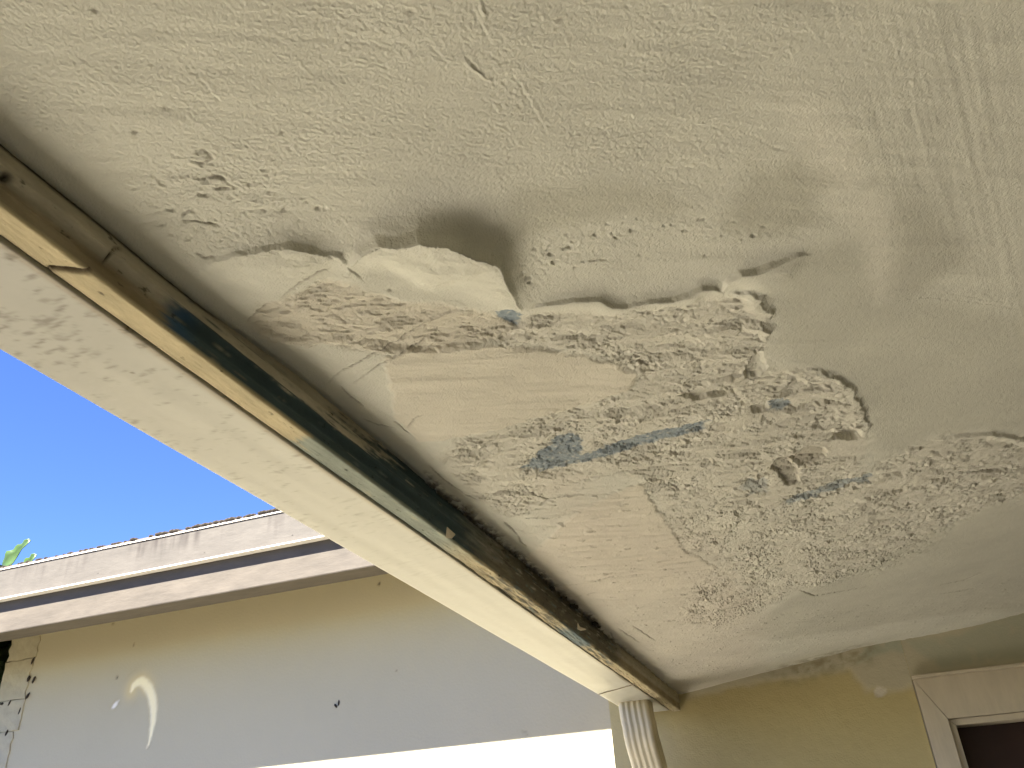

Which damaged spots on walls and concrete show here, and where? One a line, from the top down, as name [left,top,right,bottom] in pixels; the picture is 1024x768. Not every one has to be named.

spalling [233,209,1024,630]
water stain [121,512,294,569]
water stain [417,468,649,667]